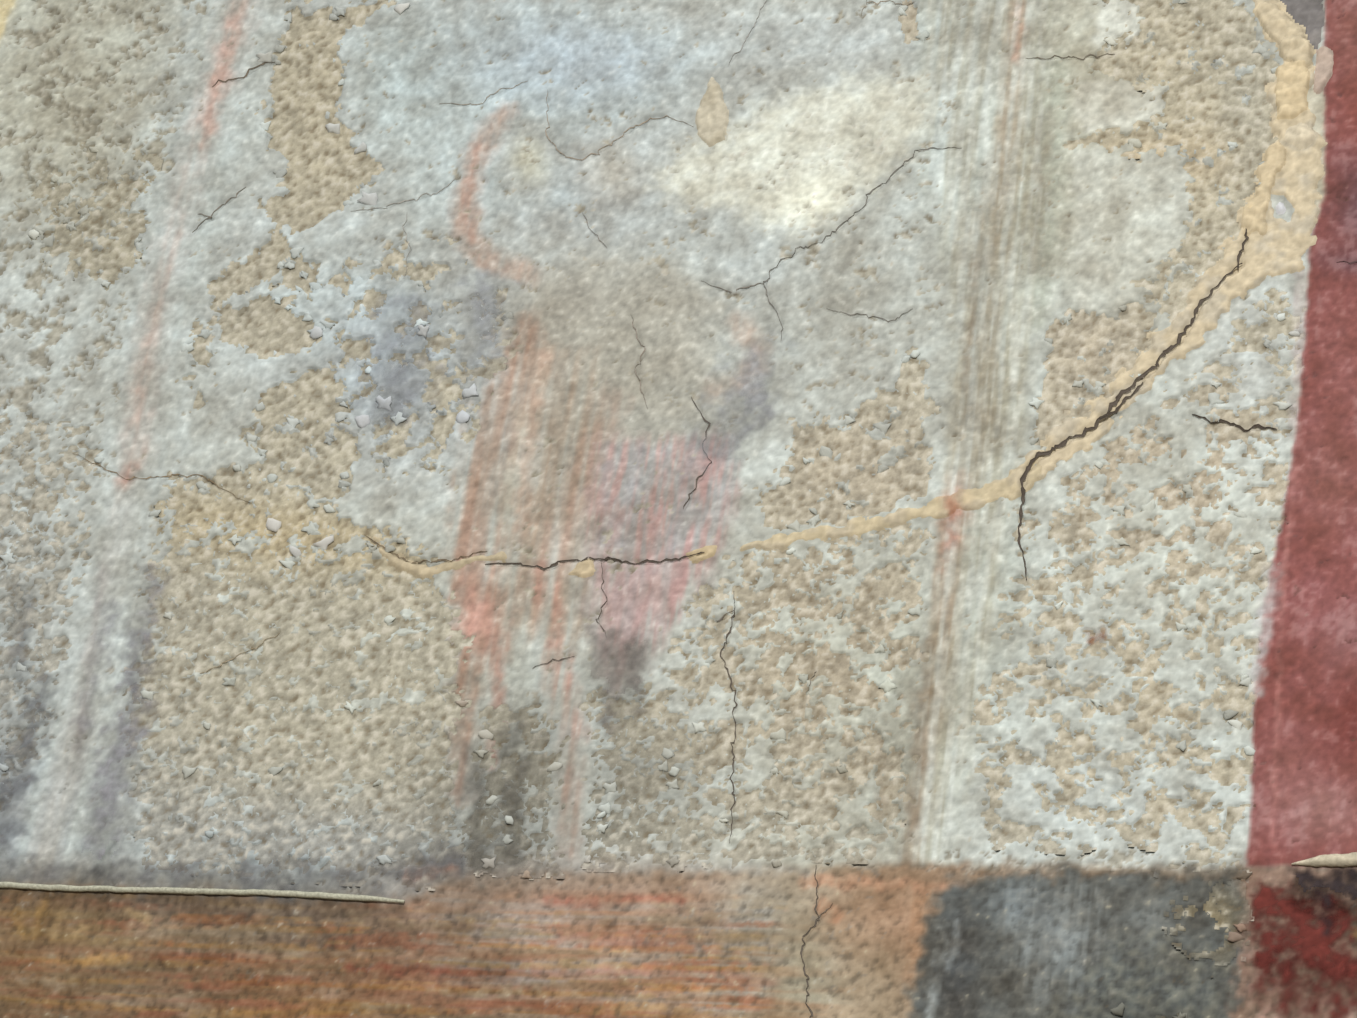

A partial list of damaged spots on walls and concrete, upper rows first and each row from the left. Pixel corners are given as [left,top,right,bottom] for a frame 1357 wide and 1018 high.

crack [440,81,693,160]
crack [703,147,961,339]
peeling [1028,0,1279,449]
peeling [118,0,571,891]
crack [683,397,712,509]
crack [1017,229,1249,580]
crack [1192,414,1277,432]
crack [365,535,705,635]
crack [717,599,737,837]
peeling [579,346,944,874]
peeling [971,288,1308,978]
crack [800,870,833,1017]